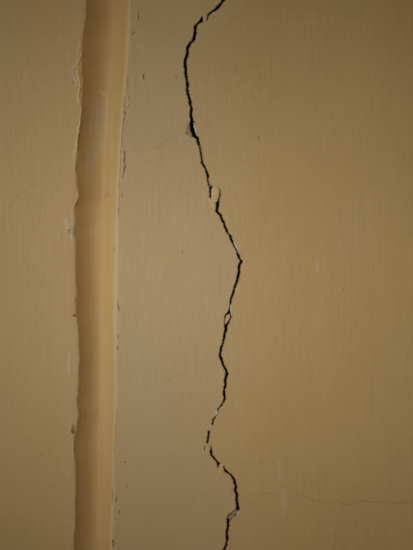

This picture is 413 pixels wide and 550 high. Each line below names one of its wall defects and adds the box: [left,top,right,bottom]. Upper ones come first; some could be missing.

crack [183,0,245,550]